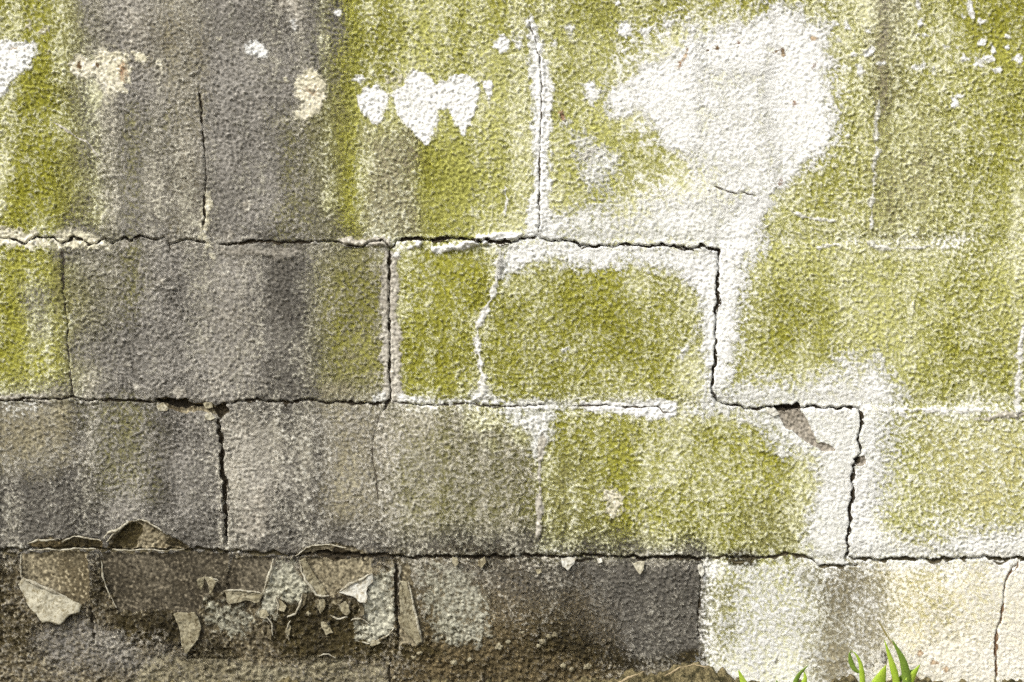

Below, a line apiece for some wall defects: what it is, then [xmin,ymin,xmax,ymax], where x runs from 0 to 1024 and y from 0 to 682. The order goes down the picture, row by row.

leakage [442,0,473,82]
crack [530,25,543,136]
crack [198,91,207,232]
leakage [616,130,665,185]
crack [0,146,1024,680]
spalling [766,402,836,452]
peeling [18,379,425,661]